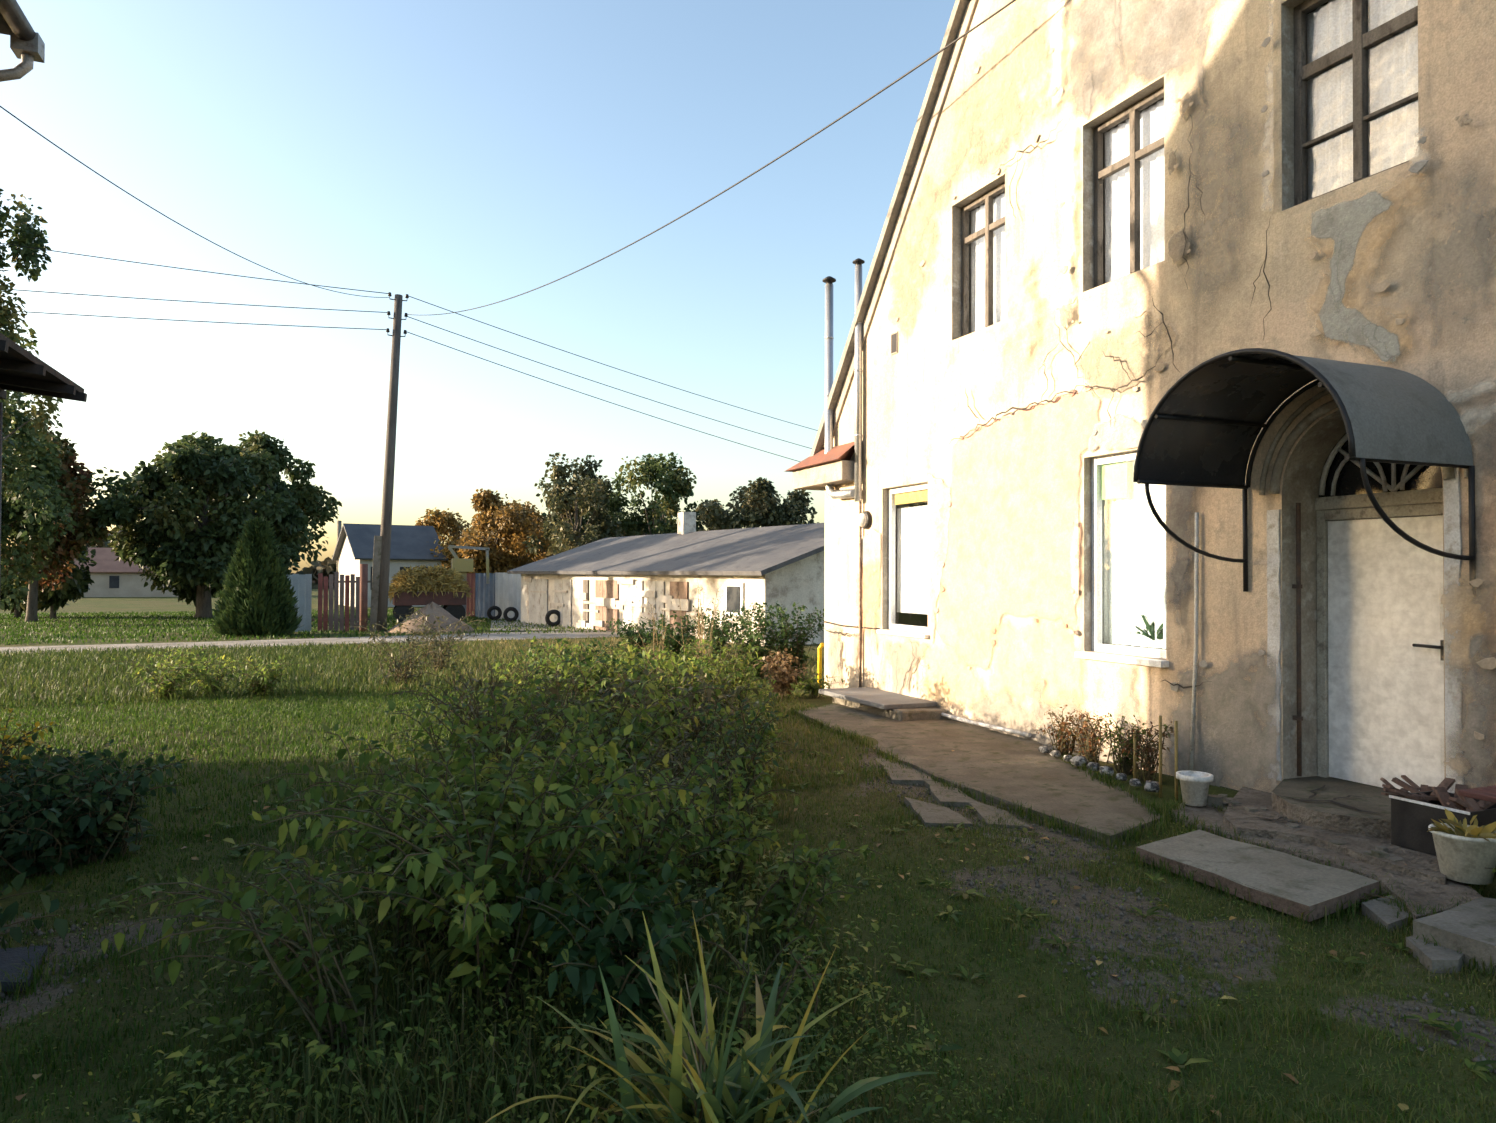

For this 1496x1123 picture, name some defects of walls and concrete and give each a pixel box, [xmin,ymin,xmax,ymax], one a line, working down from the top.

peeling [1056,129,1079,330]
crack [949,115,1205,444]
spalling [1166,146,1183,175]
crack [1250,221,1272,340]
spalling [1307,133,1429,358]
peeling [920,308,1180,708]